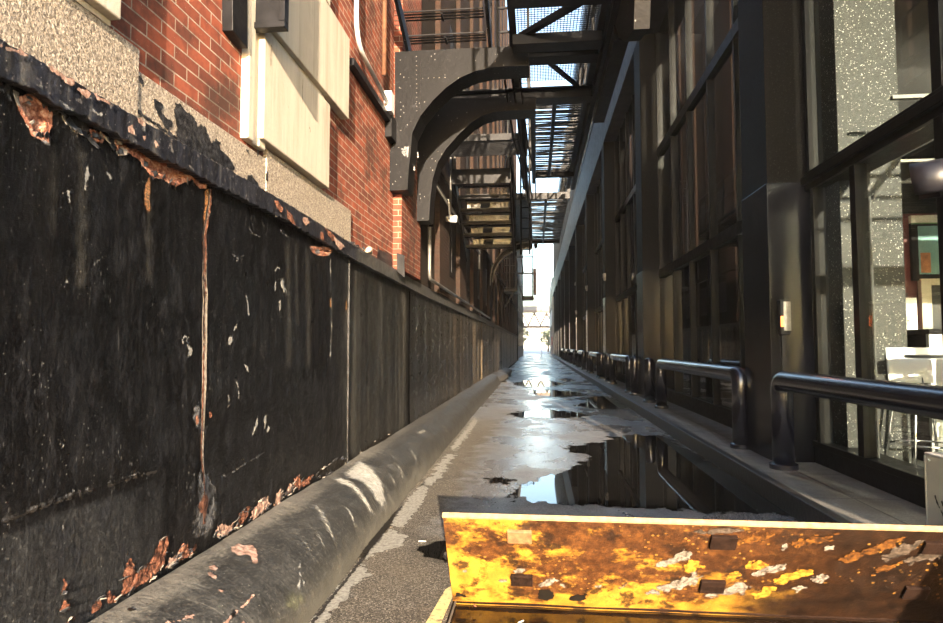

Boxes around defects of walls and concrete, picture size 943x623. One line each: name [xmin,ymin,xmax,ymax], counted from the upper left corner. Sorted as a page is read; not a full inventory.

peeling [48,65,110,116]
spalling [0,82,207,190]
peeling [60,579,75,623]
peeling [91,536,196,613]
peeling [656,551,692,567]
peeling [645,572,703,595]
peeling [705,563,787,598]
peeling [791,574,829,593]